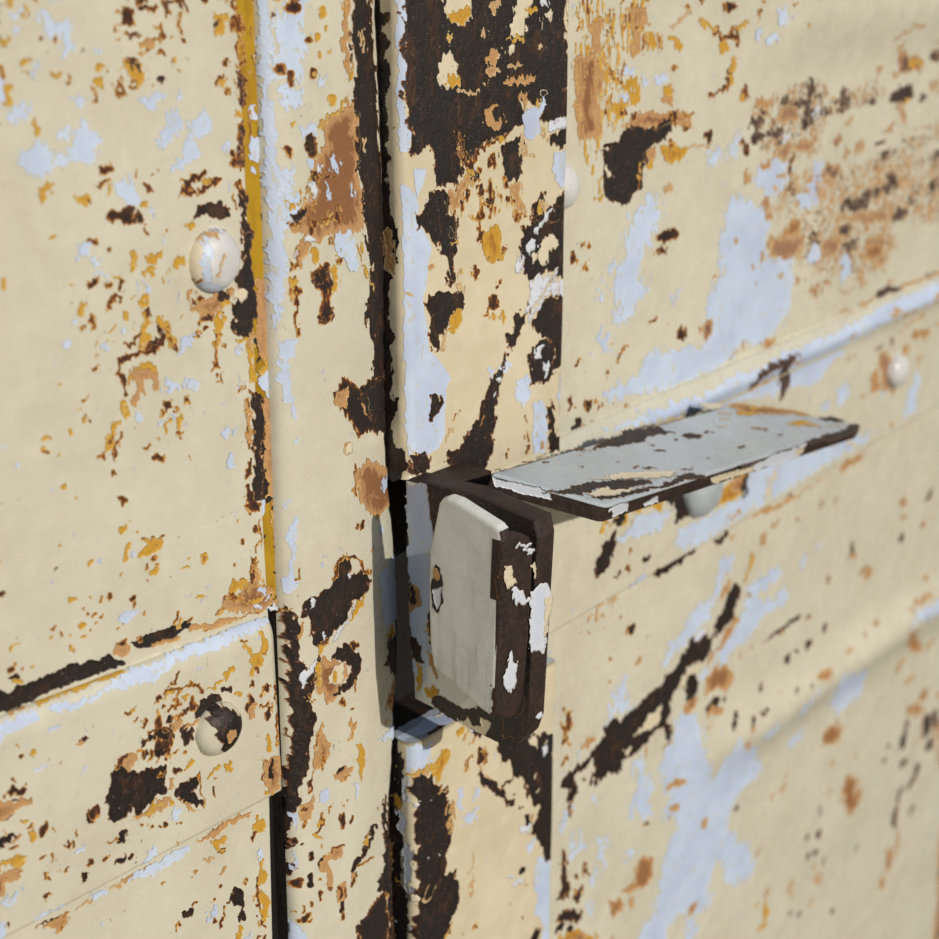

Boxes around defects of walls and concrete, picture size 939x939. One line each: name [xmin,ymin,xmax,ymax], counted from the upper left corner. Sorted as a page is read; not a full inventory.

peeling [0,0,372,876]
rust [282,0,409,482]
rust [415,132,528,291]
peeling [393,0,569,457]
peeling [591,63,695,355]
peeling [571,156,939,457]
peeling [34,756,252,934]
rust [114,630,282,797]
rust [285,717,436,939]
rust [555,848,614,939]
peeling [393,380,876,939]
rust [704,663,739,731]